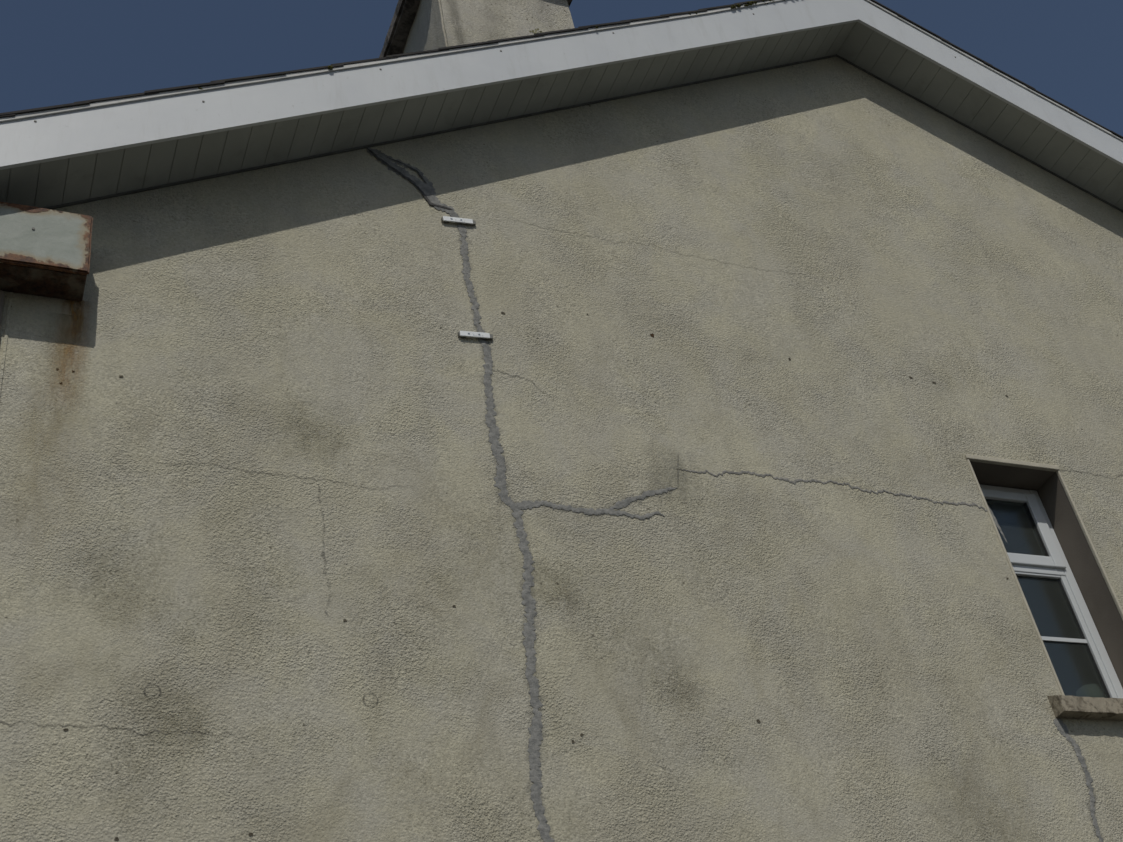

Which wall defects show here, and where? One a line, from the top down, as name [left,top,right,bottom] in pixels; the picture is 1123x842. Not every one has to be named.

crack [366,147,1007,842]
crack [1053,718,1103,842]